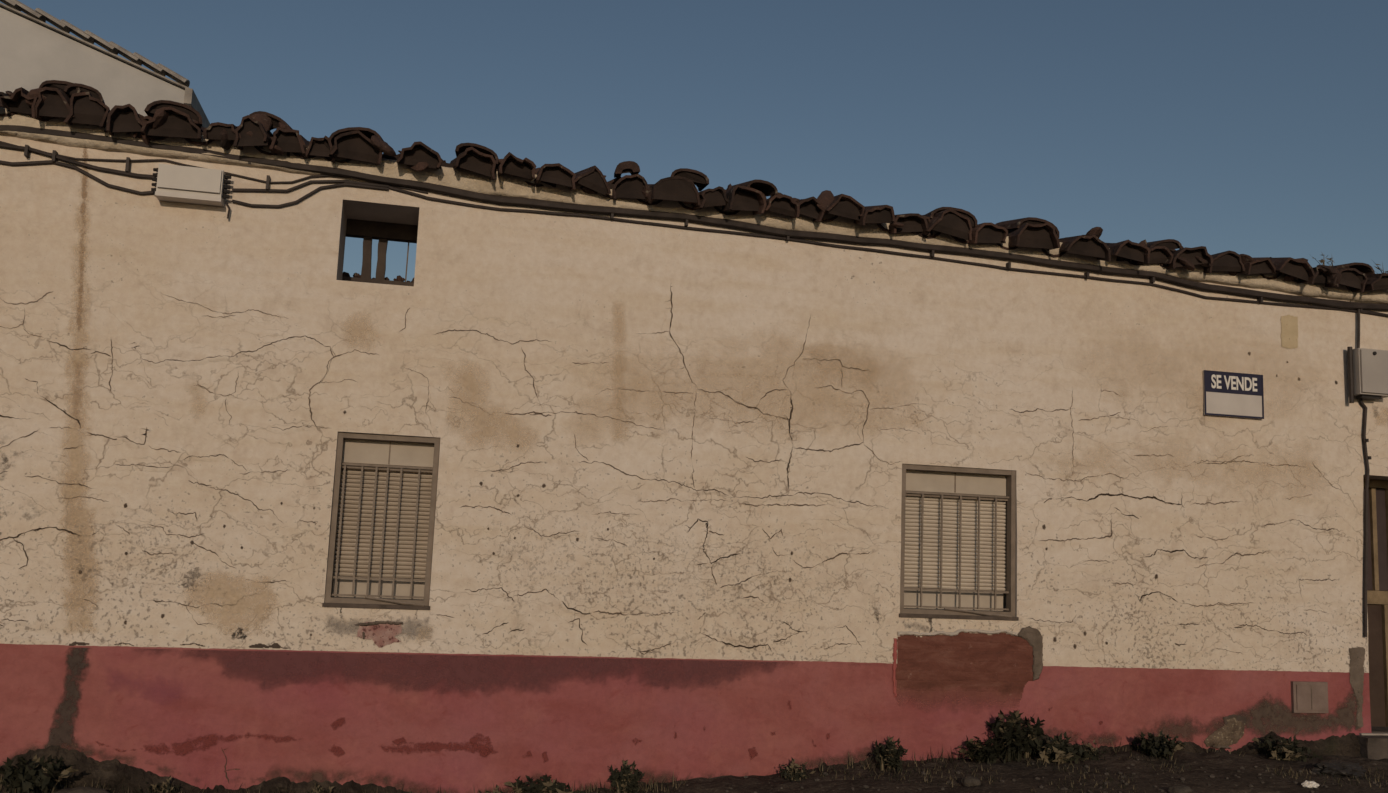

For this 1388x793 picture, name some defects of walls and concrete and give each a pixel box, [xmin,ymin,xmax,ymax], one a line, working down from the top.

water stain [63,149,94,627]
crack [0,283,926,655]
crack [1011,390,1343,653]
water stain [45,647,89,748]
spalling [0,734,412,793]
spalling [355,621,403,648]
peeling [383,734,494,757]
water stain [193,578,777,691]
peeling [892,626,1056,706]
spalling [1172,647,1365,757]